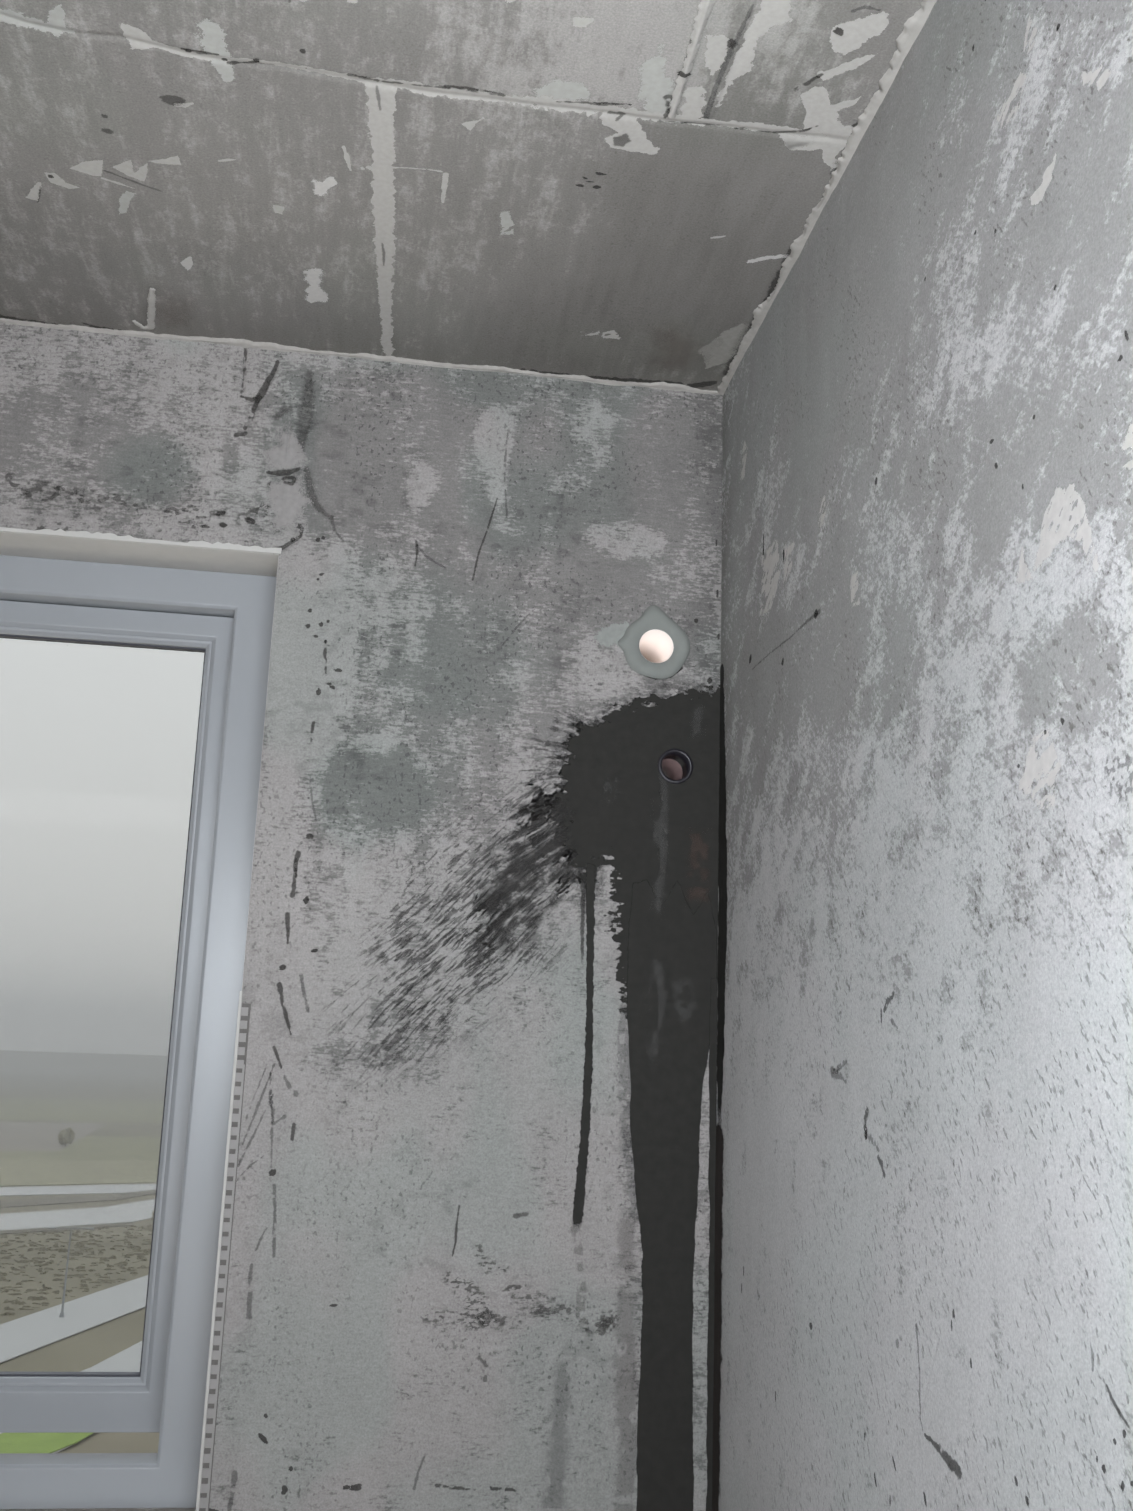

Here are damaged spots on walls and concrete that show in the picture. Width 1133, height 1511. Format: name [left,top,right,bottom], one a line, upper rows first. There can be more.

spalling [160,96,194,108]
peeling [533,77,591,101]
peeling [778,11,889,171]
peeling [599,111,660,155]
peeling [25,156,181,214]
peeling [499,211,515,235]
peeling [746,254,789,263]
peeling [583,330,621,339]
peeling [698,323,751,369]
crack [234,348,279,437]
crack [278,524,325,550]
leakage [479,664,727,1511]